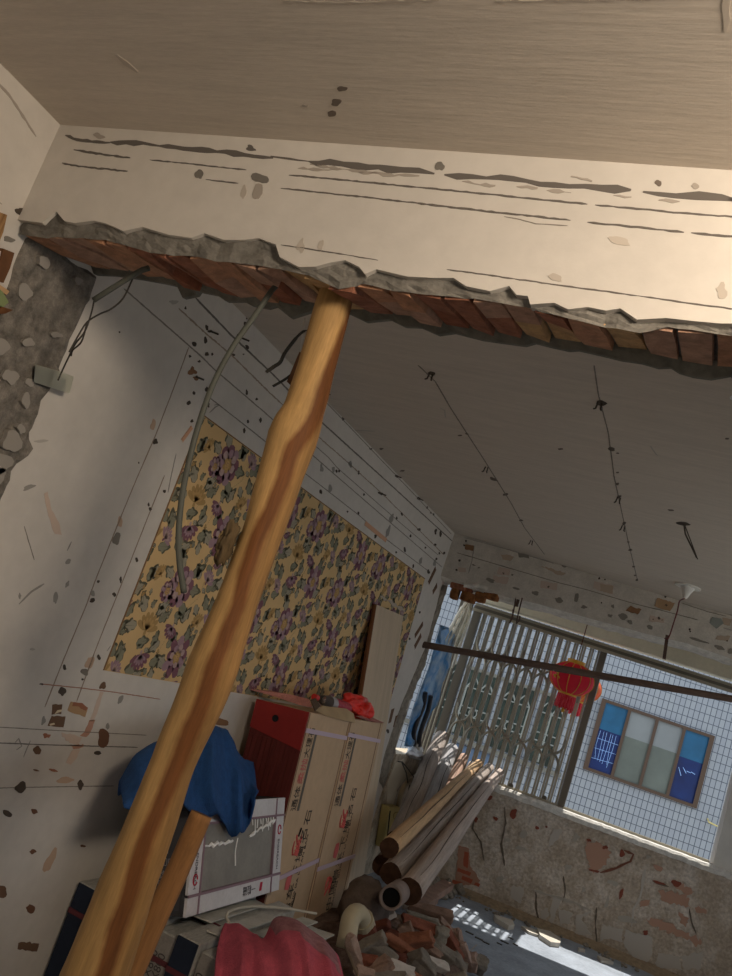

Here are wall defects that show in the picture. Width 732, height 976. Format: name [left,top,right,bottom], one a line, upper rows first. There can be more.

crack [63,135,732,237]
flaking render [0,208,732,500]
crack [306,365,731,630]
flaking render [452,846,480,887]
peeling [600,880,707,962]